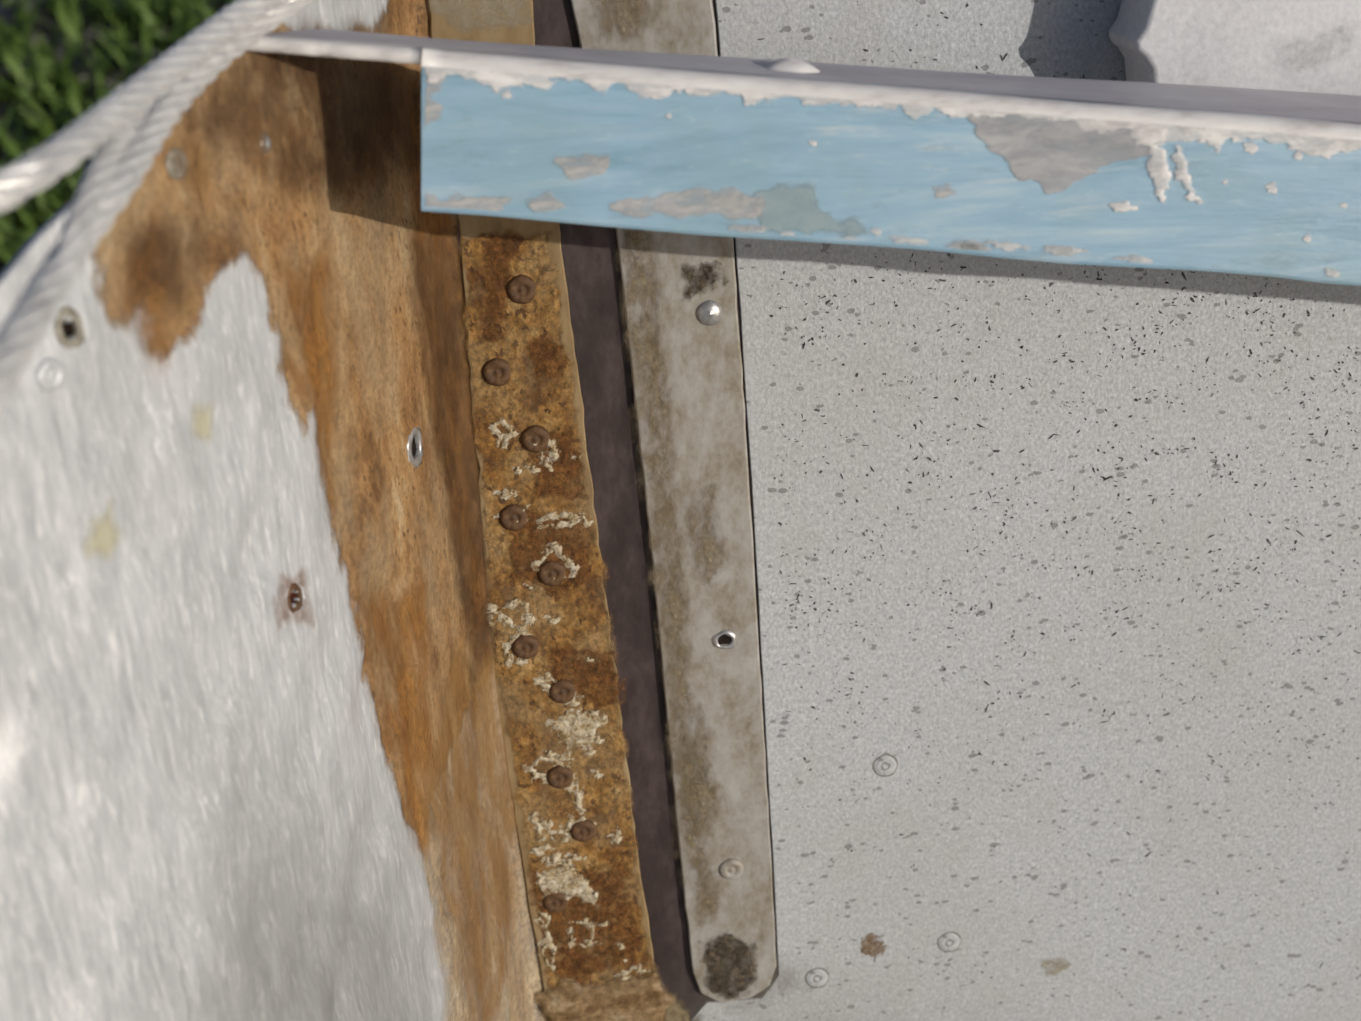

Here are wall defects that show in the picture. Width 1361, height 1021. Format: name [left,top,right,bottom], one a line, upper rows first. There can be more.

corrosion [354,0,431,38]
peeling [425,66,1361,204]
peeling [425,194,511,211]
peeling [610,184,928,245]
peeling [1109,201,1139,212]
peeling [949,240,1029,252]
corrosion [92,50,655,990]
corrosion [861,933,885,957]